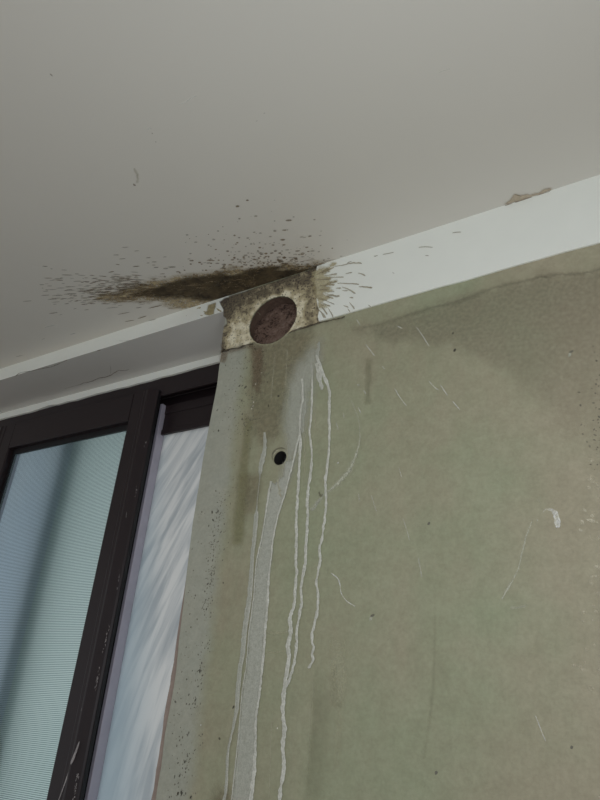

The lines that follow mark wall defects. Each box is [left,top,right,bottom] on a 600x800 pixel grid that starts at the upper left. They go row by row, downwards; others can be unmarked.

peeling [505,189,551,206]
water stain [42,220,372,322]
water stain [222,342,331,800]